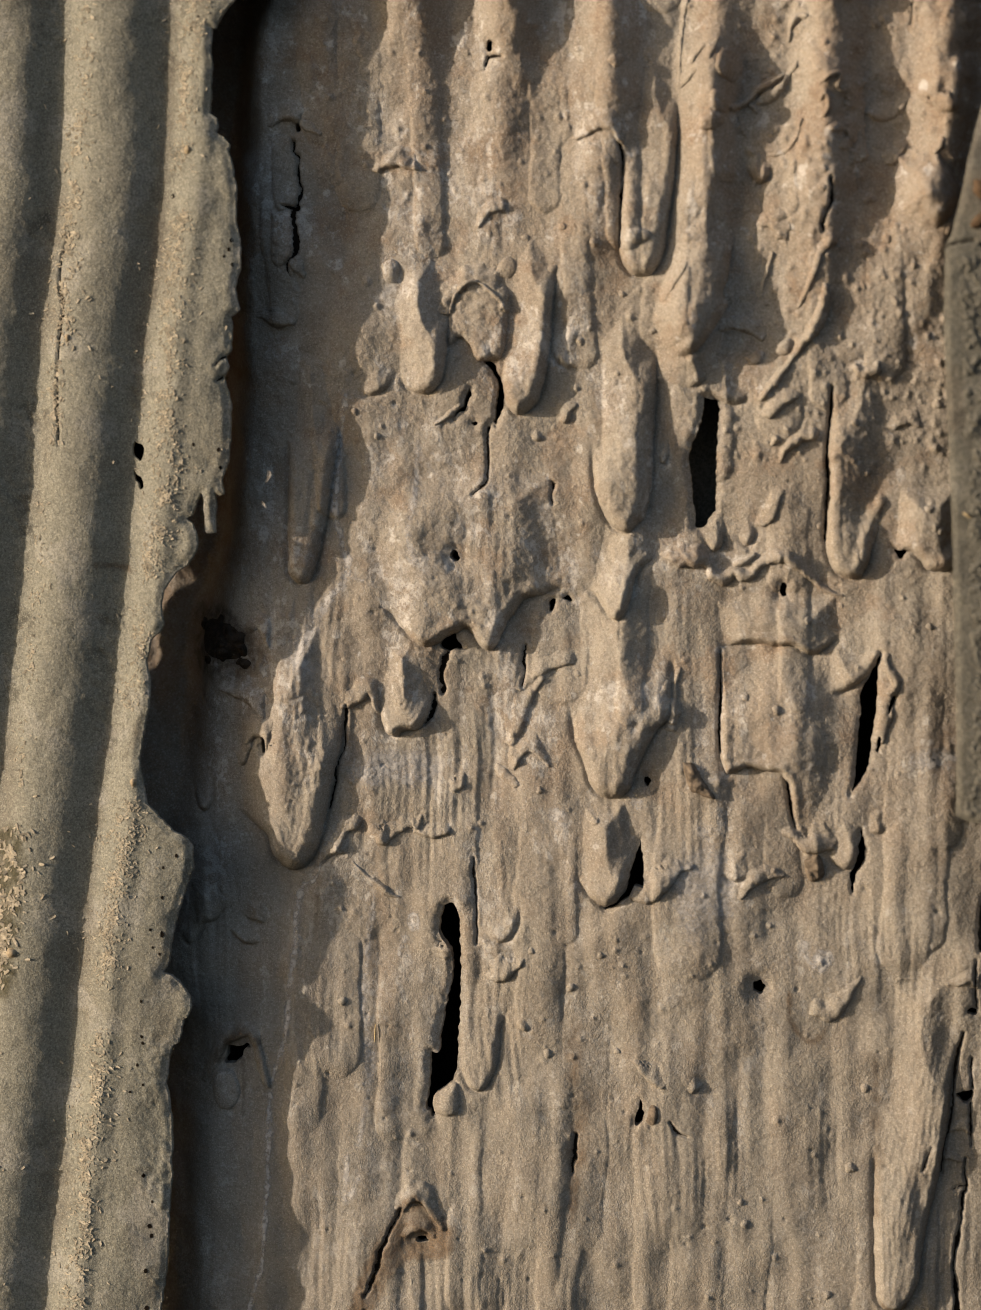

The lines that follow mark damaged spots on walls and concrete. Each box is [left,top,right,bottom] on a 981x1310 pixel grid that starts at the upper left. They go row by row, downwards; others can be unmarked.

crack [282,142,303,276]
crack [824,387,833,540]
spalling [201,614,251,669]
water stain [0,831,20,993]
crack [922,960,977,1310]
crack [365,1209,401,1296]